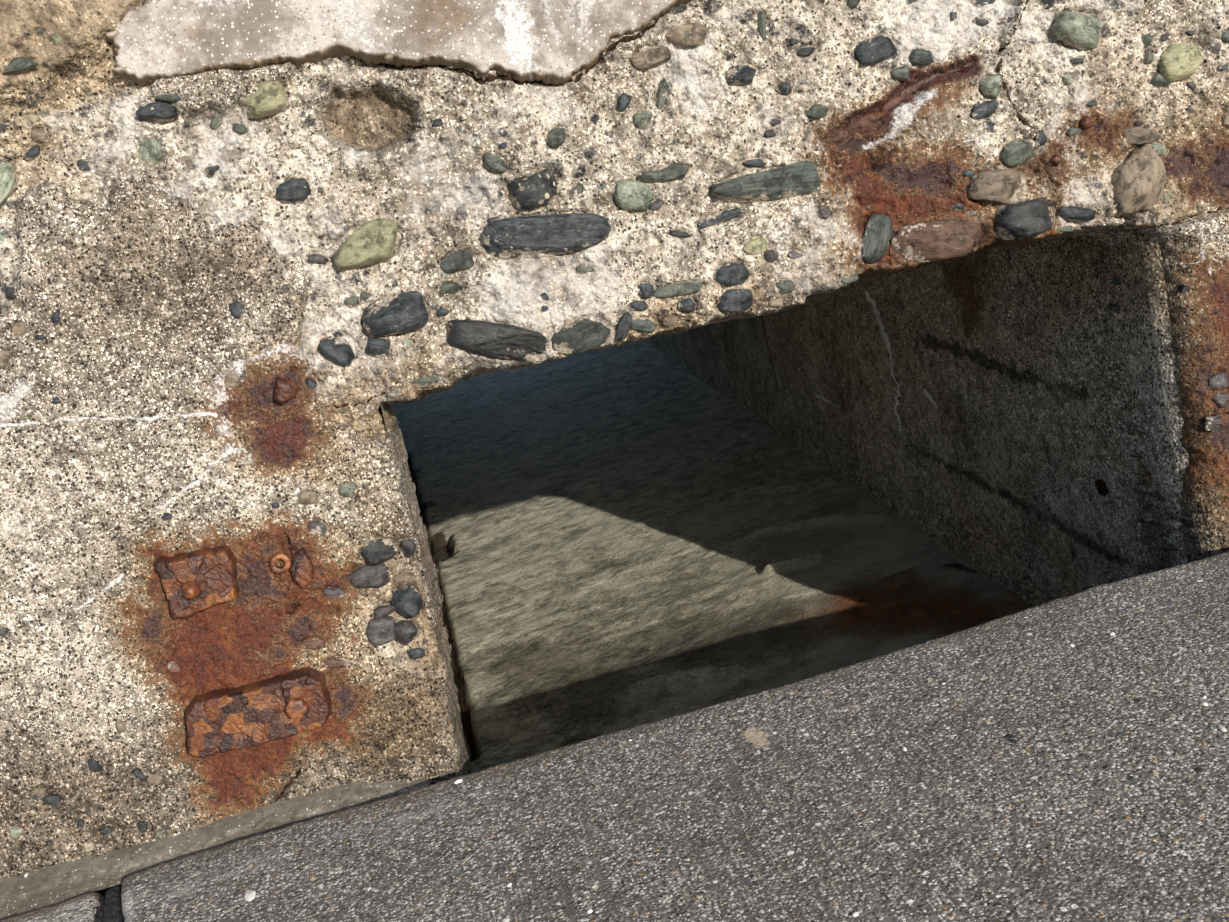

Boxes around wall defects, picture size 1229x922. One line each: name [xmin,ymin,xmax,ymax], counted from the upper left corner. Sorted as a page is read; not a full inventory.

crack [360,15,662,86]
corrosion [794,49,1140,277]
crack [996,0,1059,216]
corrosion [195,344,341,484]
corrosion [1159,107,1229,528]
corrosion [107,499,386,825]
crack [407,455,476,762]
corrosion [823,572,1027,634]